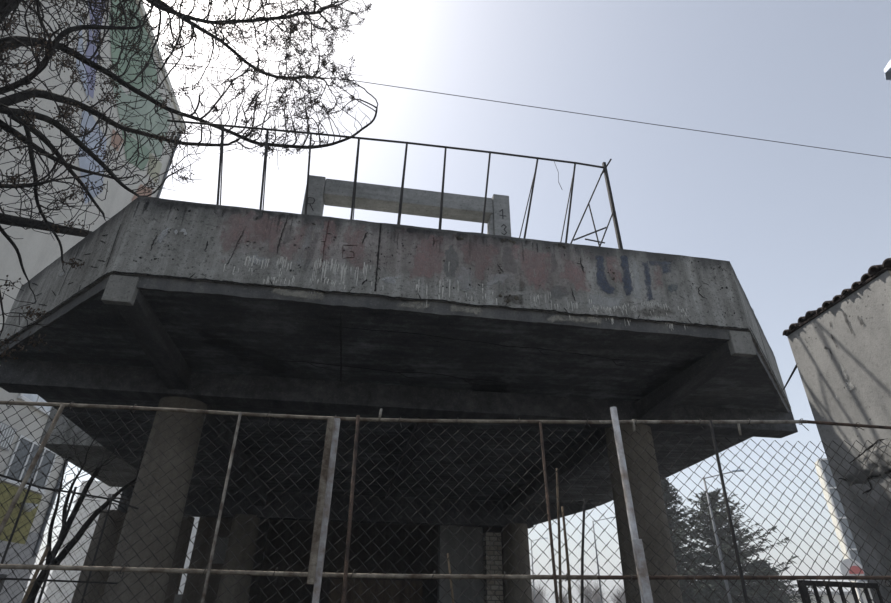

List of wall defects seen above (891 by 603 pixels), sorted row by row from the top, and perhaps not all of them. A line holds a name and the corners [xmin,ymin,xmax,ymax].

crack [3,215,791,407]
crack [839,438,891,494]